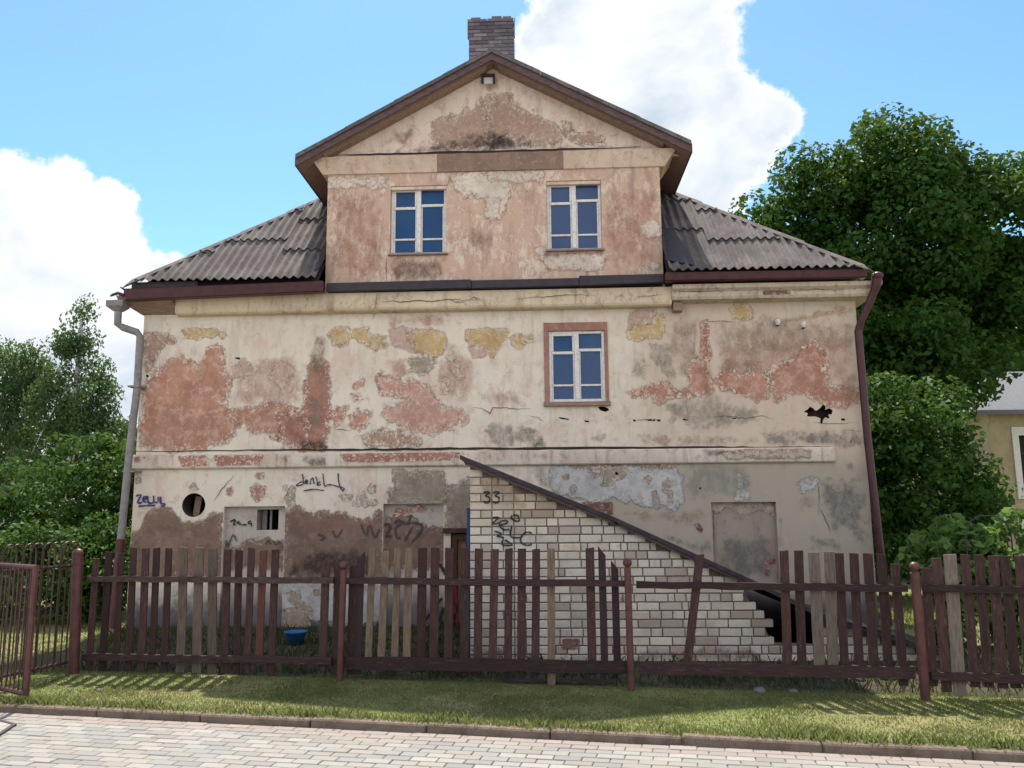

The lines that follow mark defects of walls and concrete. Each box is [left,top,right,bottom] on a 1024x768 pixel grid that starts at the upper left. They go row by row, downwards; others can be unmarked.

leakage [431,135,536,151]
peeling [429,91,606,151]
crack [373,259,478,317]
peeling [465,327,535,360]
peeling [626,309,667,342]
peeling [625,320,860,424]
peeling [130,325,470,627]
peeling [548,464,685,515]